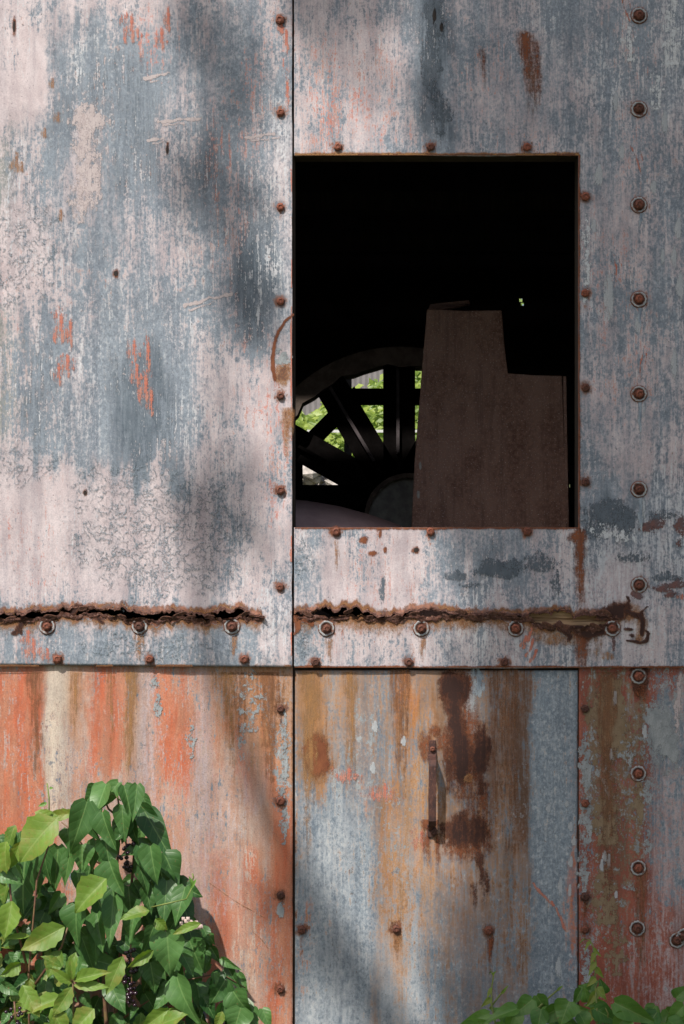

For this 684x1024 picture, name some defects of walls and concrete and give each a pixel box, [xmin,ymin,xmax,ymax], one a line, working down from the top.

peeling [119,8,171,49]
corrosion [516,32,541,99]
peeling [41,102,115,223]
peeling [51,307,76,386]
peeling [126,335,154,416]
peeling [274,348,293,385]
corrosion [280,306,293,455]
corrosion [290,152,587,609]
crack [0,603,265,635]
crack [293,596,650,645]
corrosion [285,632,683,904]